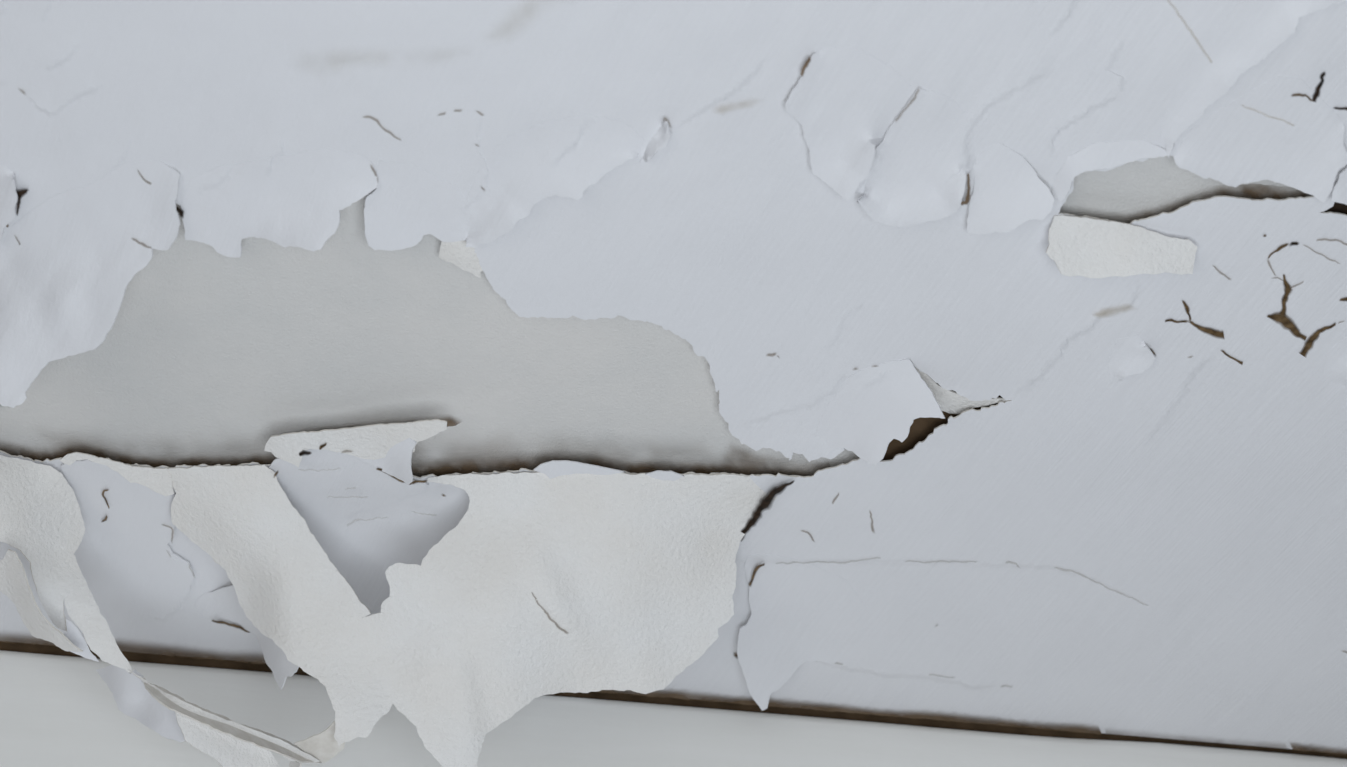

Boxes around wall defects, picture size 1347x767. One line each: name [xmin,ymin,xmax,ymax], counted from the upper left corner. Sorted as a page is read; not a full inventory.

peeling [785,46,1347,278]
crack [1150,301,1243,365]
crack [1264,235,1347,357]
peeling [0,148,1006,767]